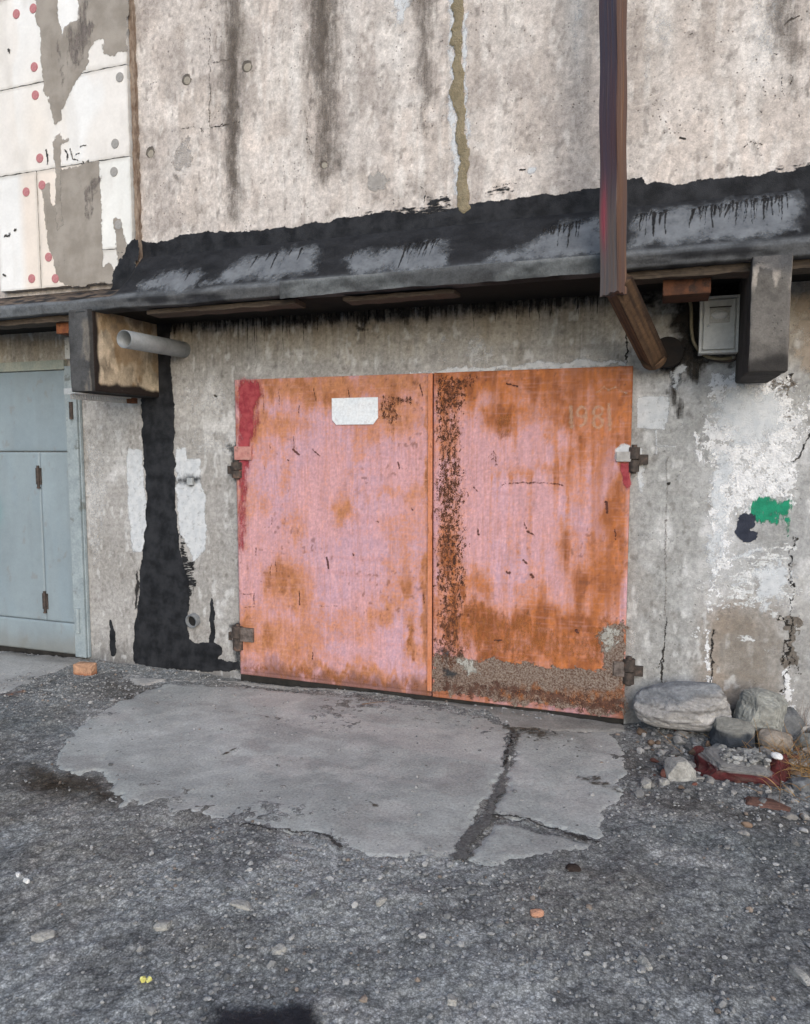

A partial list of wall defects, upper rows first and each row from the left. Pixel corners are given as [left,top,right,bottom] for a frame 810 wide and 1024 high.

leakage [223,0,242,218]
leakage [307,0,341,182]
peeling [42,160,114,288]
corrosion [378,395,412,424]
crack [789,433,810,463]
corrosion [431,374,630,717]
crack [658,593,668,683]
peeling [697,370,810,710]
crack [777,536,801,693]
crack [449,734,599,861]